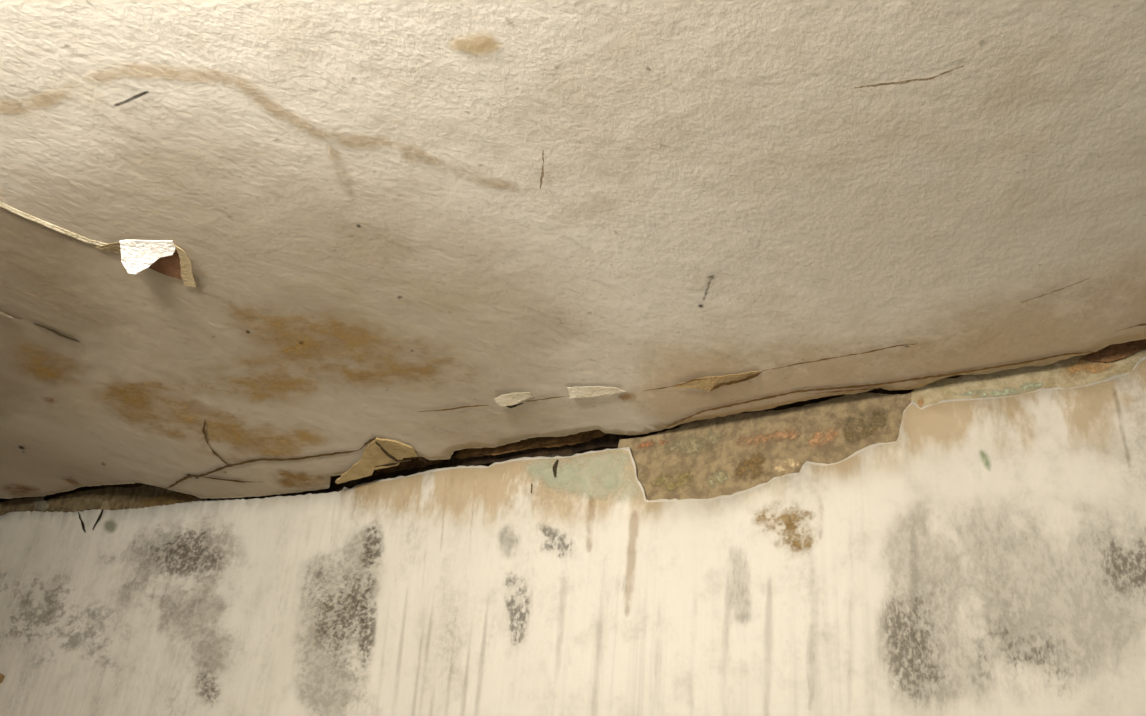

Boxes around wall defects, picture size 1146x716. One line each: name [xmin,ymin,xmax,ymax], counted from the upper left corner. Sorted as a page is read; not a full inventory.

crack [854,65,964,88]
crack [538,150,546,189]
peeling [0,202,196,287]
crack [1021,278,1090,303]
crack [164,324,1146,501]
spalling [618,339,1146,501]
crack [0,486,103,532]
leakage [157,533,216,572]
leakage [320,579,374,651]